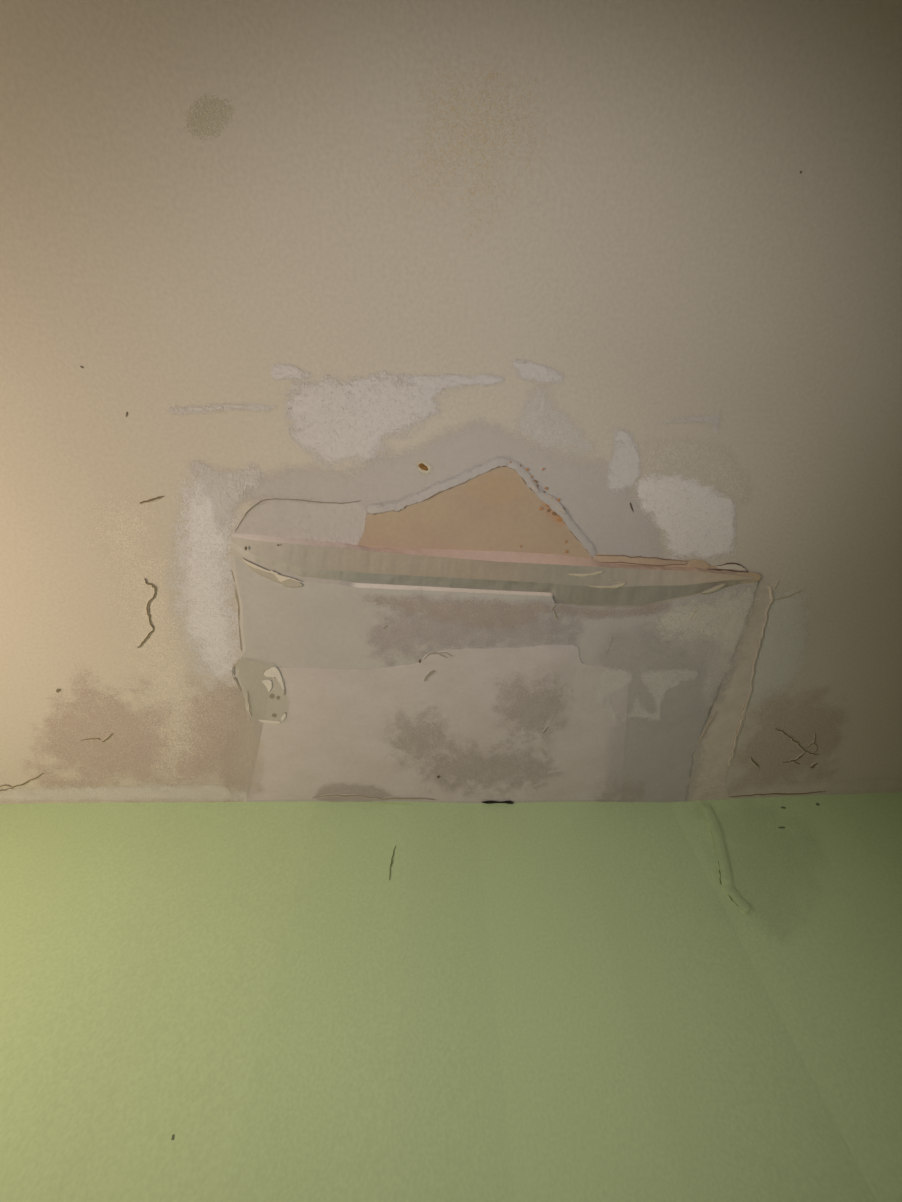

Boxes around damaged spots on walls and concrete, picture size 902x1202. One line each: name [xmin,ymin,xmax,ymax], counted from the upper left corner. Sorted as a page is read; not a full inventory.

peeling [358,455,598,559]
crack [137,578,157,648]
water stain [21,657,249,803]
crack [750,728,819,770]
water stain [728,671,852,799]